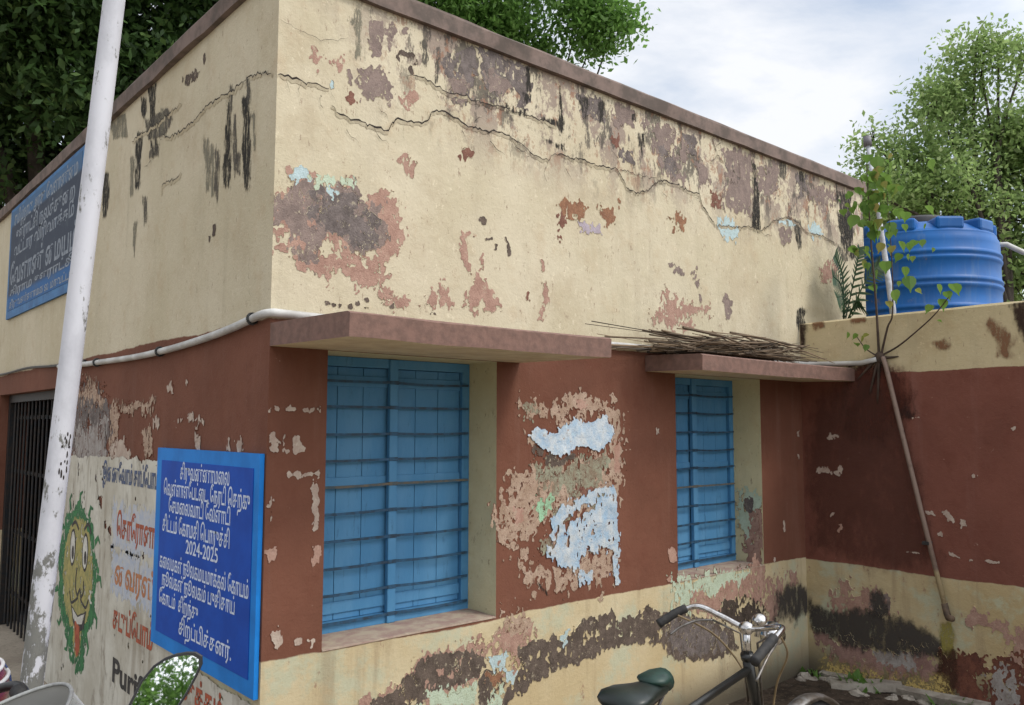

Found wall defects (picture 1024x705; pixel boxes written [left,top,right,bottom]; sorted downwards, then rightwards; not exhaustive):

peeling [309,20,419,111]
damp [102,172,110,218]
damp [110,83,173,253]
damp [203,77,256,200]
peeling [272,164,511,317]
crack [132,60,837,246]
peeling [556,197,621,243]
peeling [576,91,838,246]
peeling [71,373,159,480]
spalling [358,486,798,705]
damp [774,584,945,659]
spalling [809,606,1024,705]